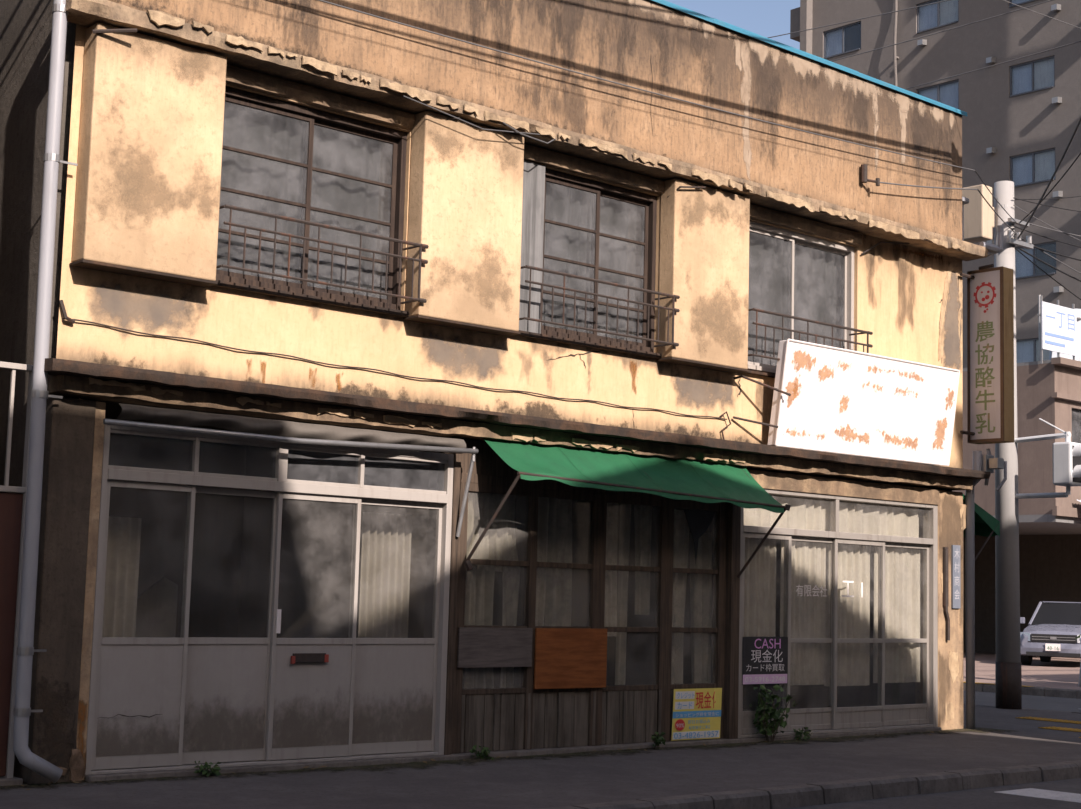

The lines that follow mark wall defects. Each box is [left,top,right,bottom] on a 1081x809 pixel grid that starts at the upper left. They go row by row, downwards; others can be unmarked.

spalling [147,10,214,34]
water stain [628,0,715,39]
water stain [234,33,450,97]
spalling [226,35,672,171]
water stain [728,31,954,179]
water stain [91,283,204,332]
water stain [893,244,914,324]
water stain [423,331,506,378]
peeling [317,408,442,428]
peeling [511,432,546,442]
peeling [572,438,639,453]
peeling [704,453,745,463]